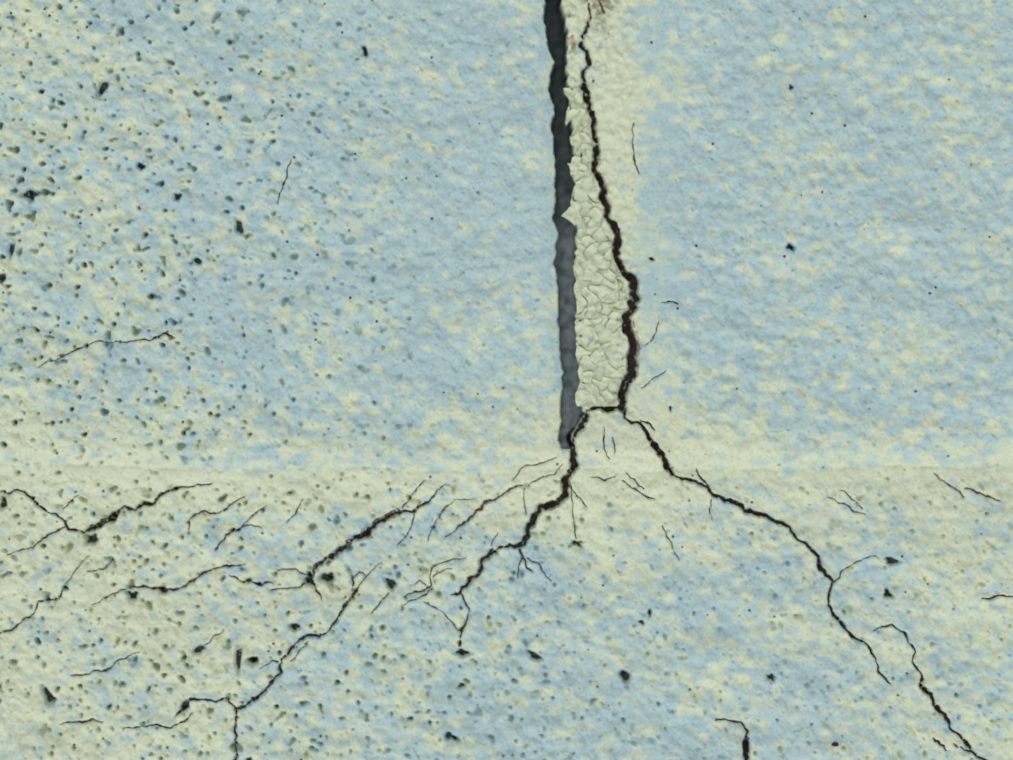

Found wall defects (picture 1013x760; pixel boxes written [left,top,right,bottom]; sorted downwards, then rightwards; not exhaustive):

crack [39,332,175,367]
crack [404,0,987,760]
crack [934,473,1000,501]
crack [0,483,212,633]
crack [91,480,446,606]
crack [982,593,1013,601]
crack [71,652,140,676]
crack [124,563,381,760]
crack [60,717,102,725]